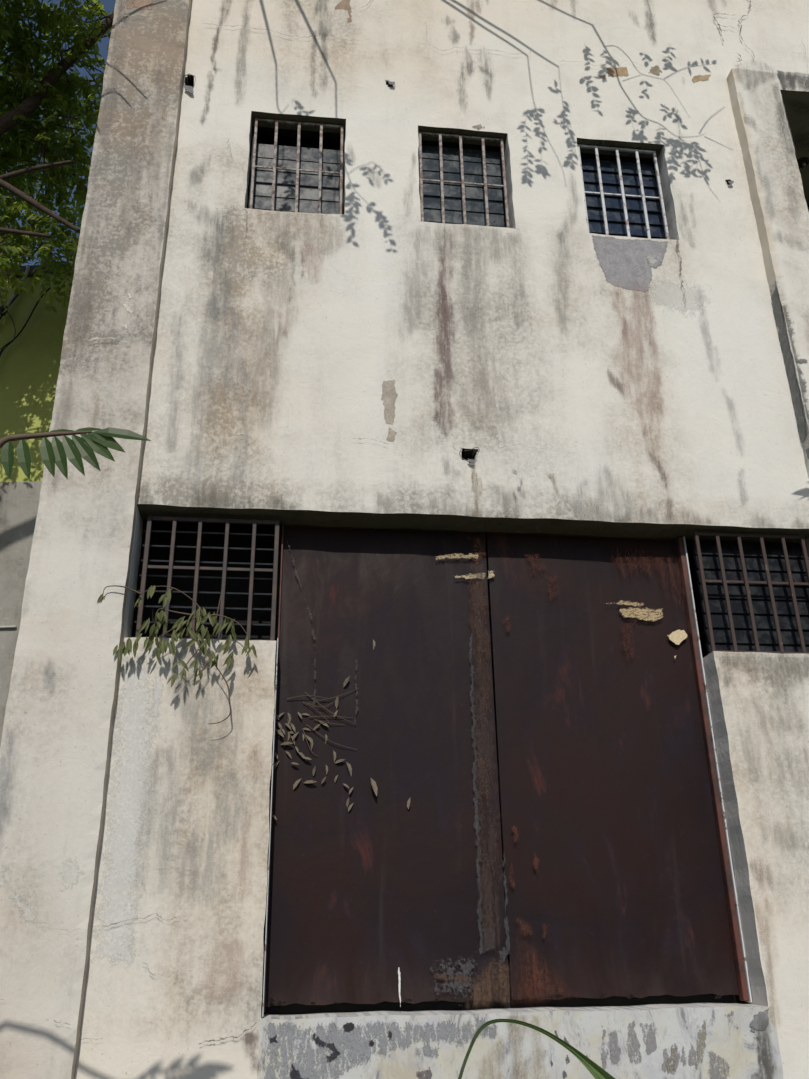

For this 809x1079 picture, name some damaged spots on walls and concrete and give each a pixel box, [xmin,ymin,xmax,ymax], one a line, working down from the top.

peeling [335,0,352,23]
crack [713,0,755,62]
peeling [599,67,629,78]
flaking render [592,235,668,292]
water stain [434,235,452,434]
peeling [381,380,398,441]
rust [435,964,509,1005]
water stain [757,1028,774,1079]